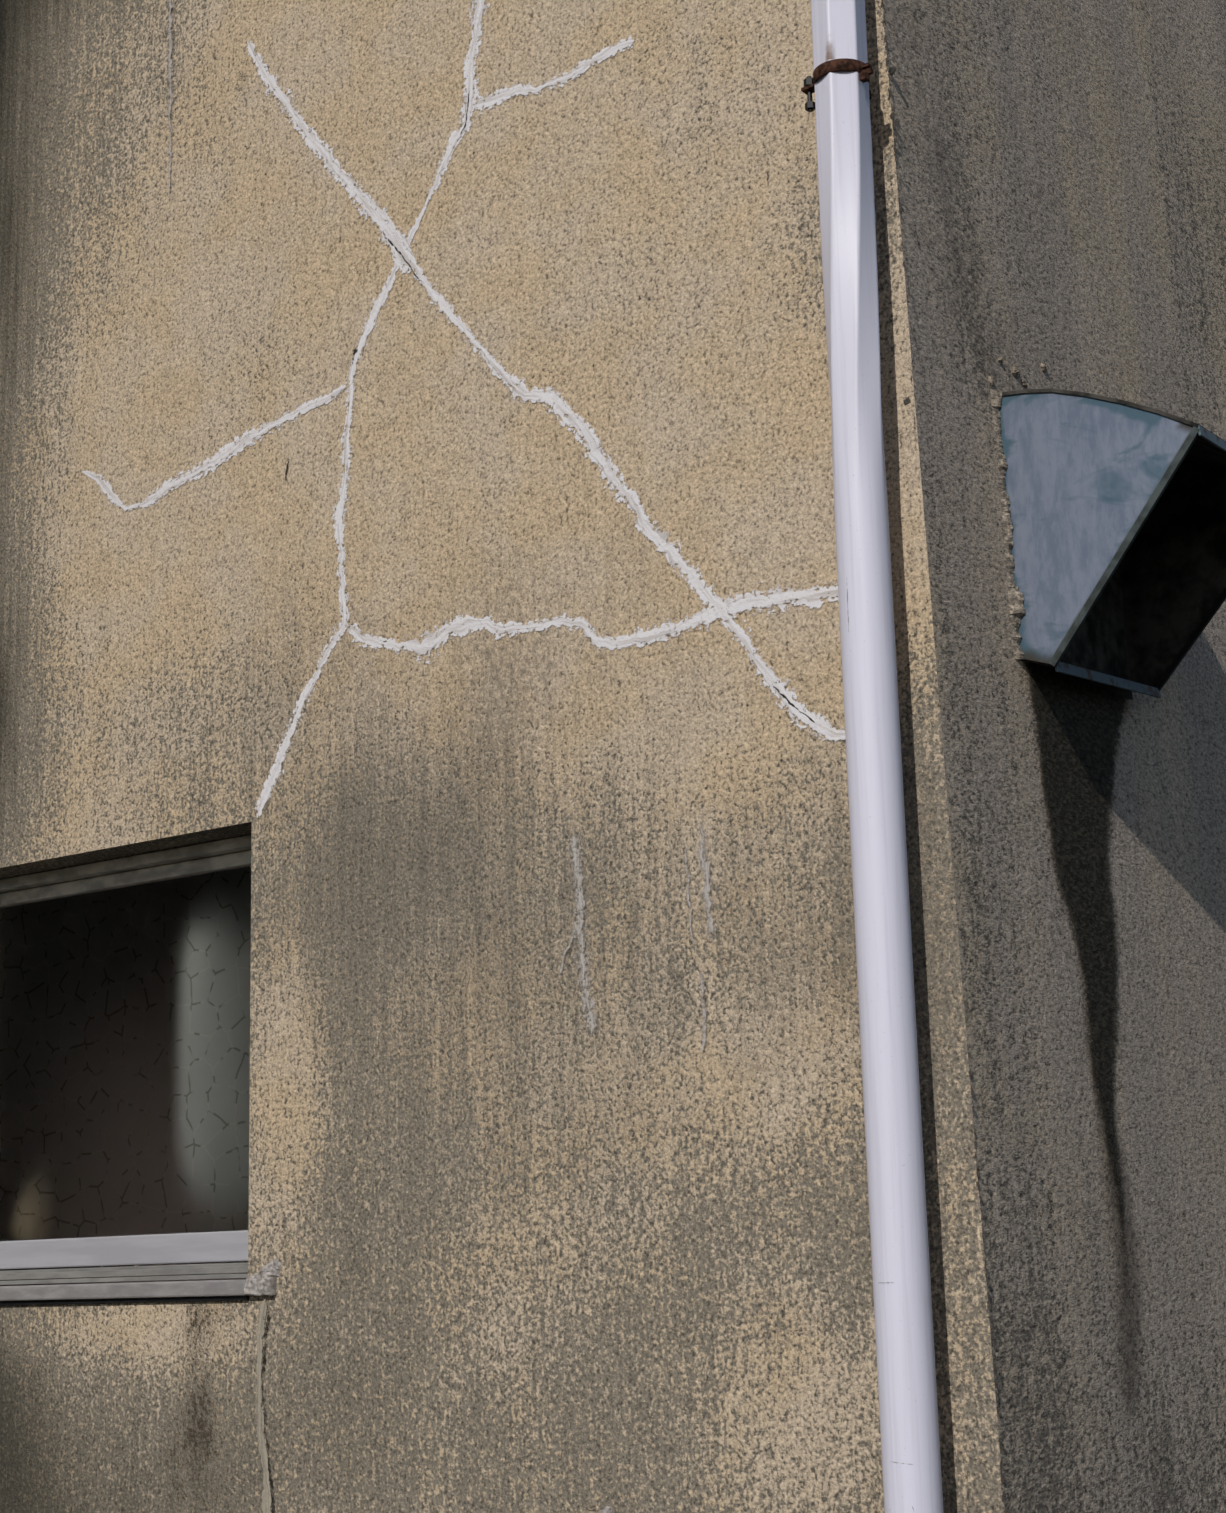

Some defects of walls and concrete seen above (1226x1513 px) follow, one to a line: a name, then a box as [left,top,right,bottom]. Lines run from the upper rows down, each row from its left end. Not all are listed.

crack [82,0,846,818]
crack [255,1297,274,1513]